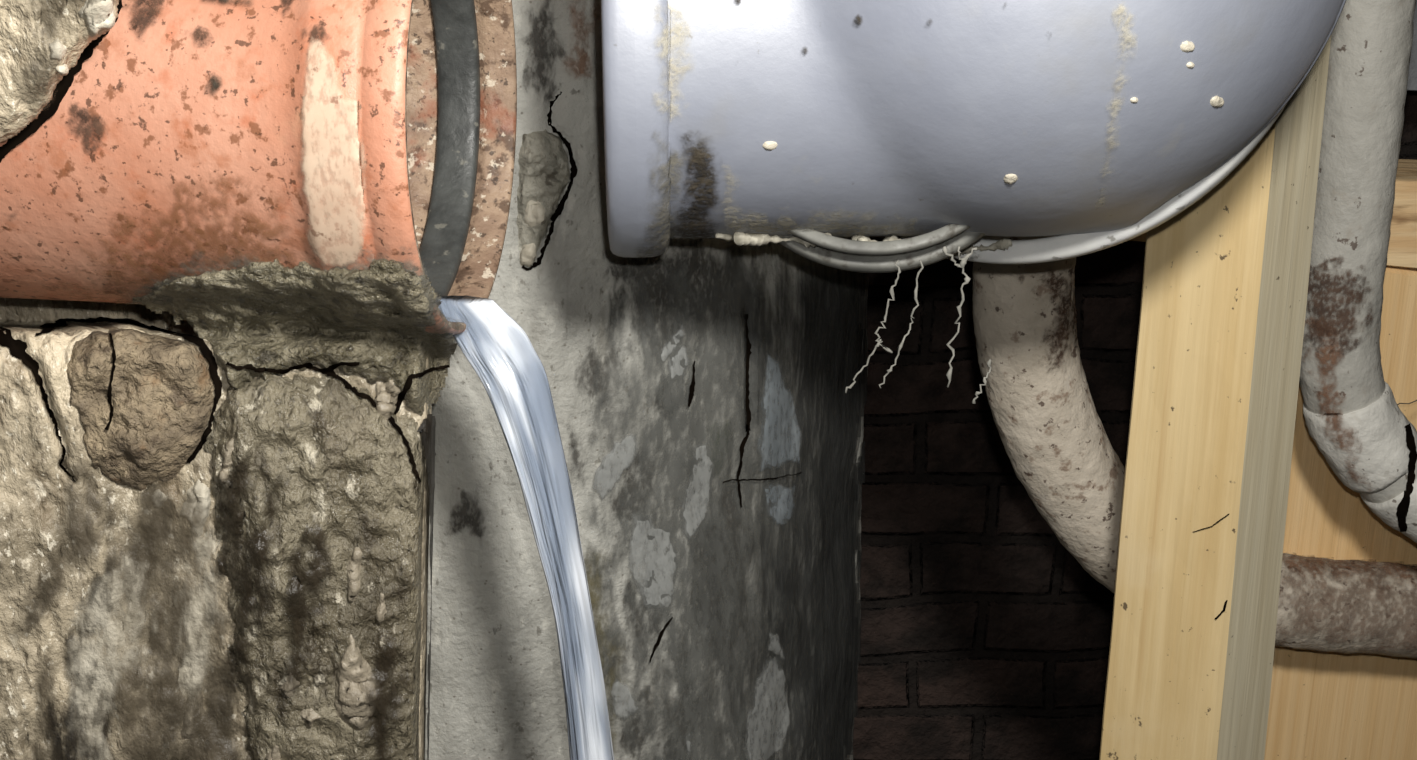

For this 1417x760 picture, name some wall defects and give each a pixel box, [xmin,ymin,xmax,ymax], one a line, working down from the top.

crack [0,0,123,163]
crack [522,91,578,270]
damp [26,461,329,760]
crack [0,317,450,483]
damp [368,644,400,760]
damp [417,414,436,760]
crack [650,617,673,662]
damp [579,239,869,760]
crack [723,314,802,507]